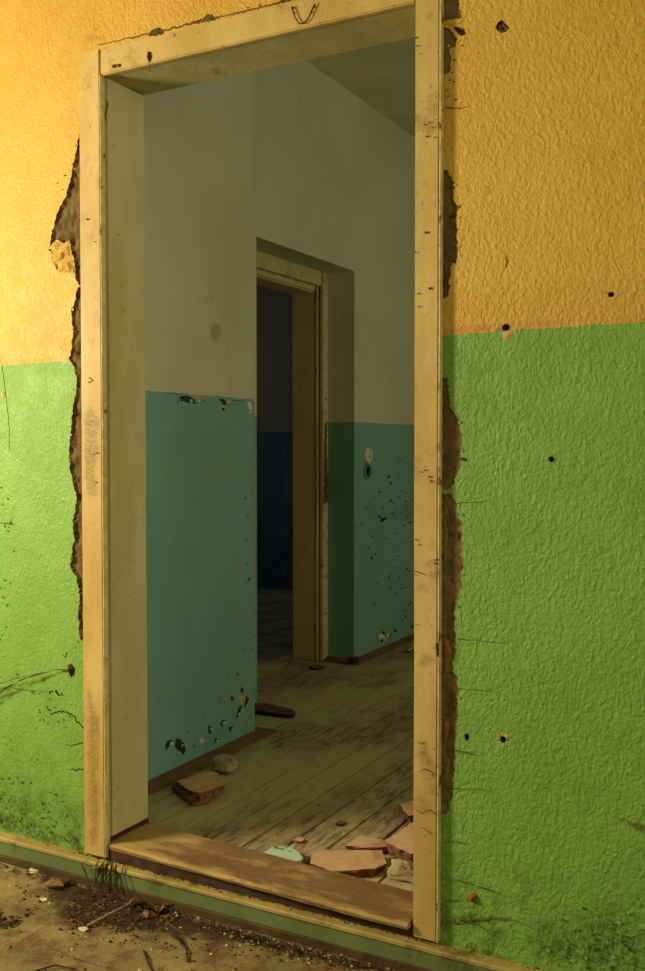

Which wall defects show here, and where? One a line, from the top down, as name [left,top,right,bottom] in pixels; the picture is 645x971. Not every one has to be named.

flaking render [444,0,466,100]
flaking render [443,170,462,299]
flaking render [49,134,83,657]
peeling [166,392,252,414]
flaking render [441,377,466,815]
peeling [165,687,250,755]